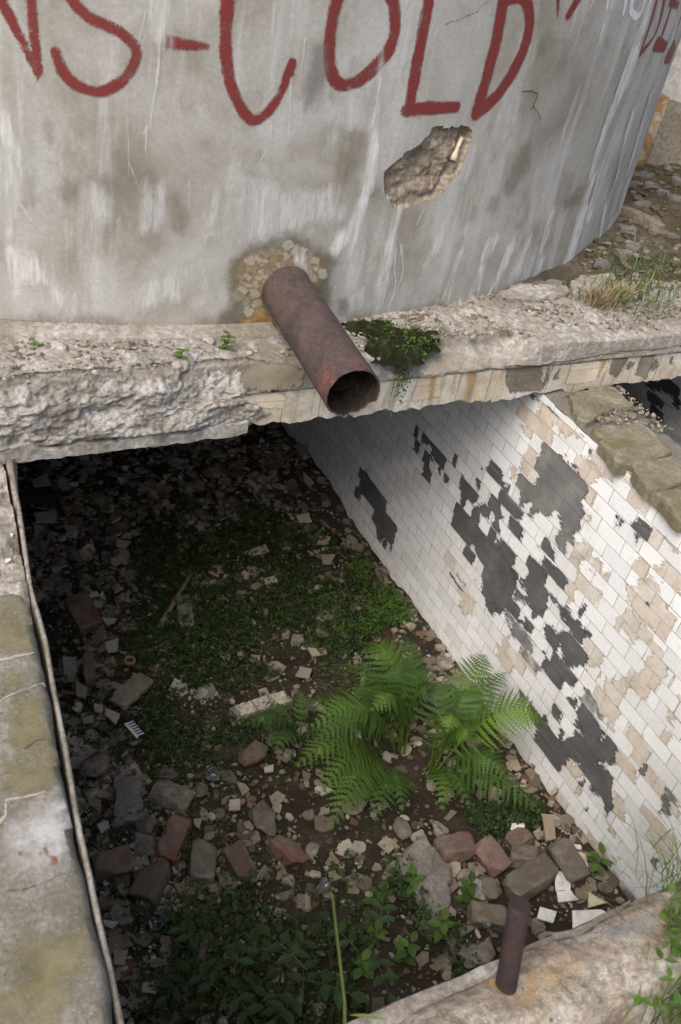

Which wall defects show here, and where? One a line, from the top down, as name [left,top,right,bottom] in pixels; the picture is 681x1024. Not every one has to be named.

spalling [383,125,473,212]
spalling [0,327,305,452]
peeling [354,467,397,553]
peeling [411,355,681,878]
crack [0,791,46,824]